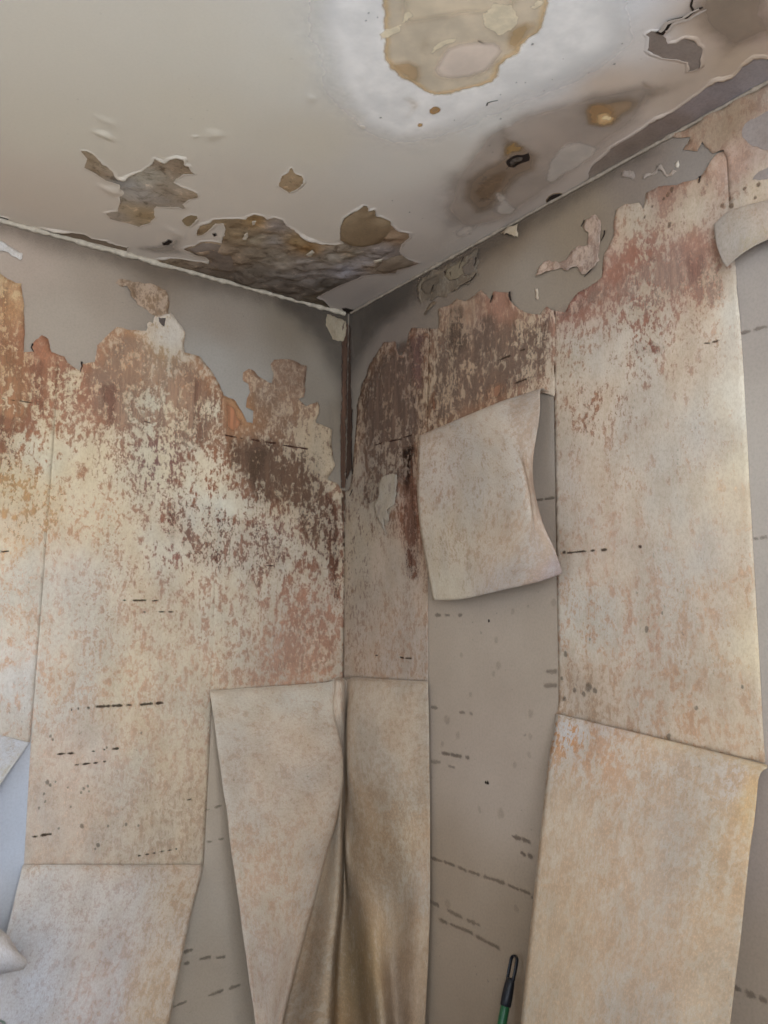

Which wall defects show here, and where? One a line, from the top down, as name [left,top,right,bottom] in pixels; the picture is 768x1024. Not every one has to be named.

peeling [643,29,706,73]
spalling [78,149,421,341]
water stain [287,0,643,384]
flaking render [501,224,518,237]